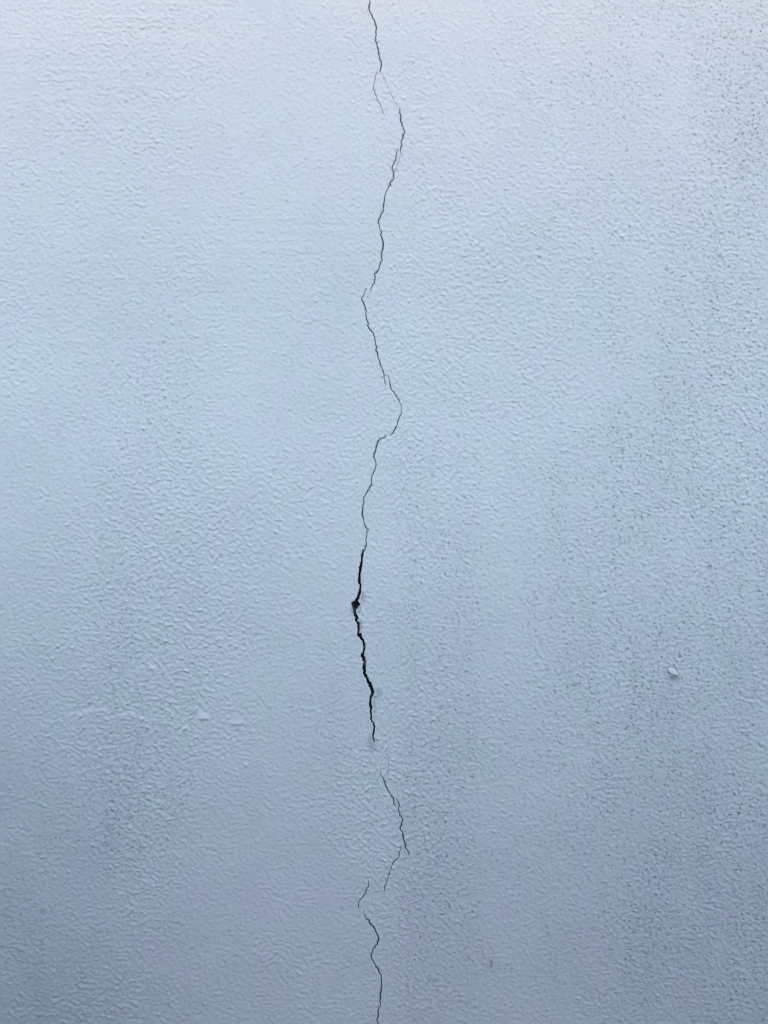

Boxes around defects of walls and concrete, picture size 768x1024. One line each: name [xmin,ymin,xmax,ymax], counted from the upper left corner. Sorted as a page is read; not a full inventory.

crack [351,0,409,1023]